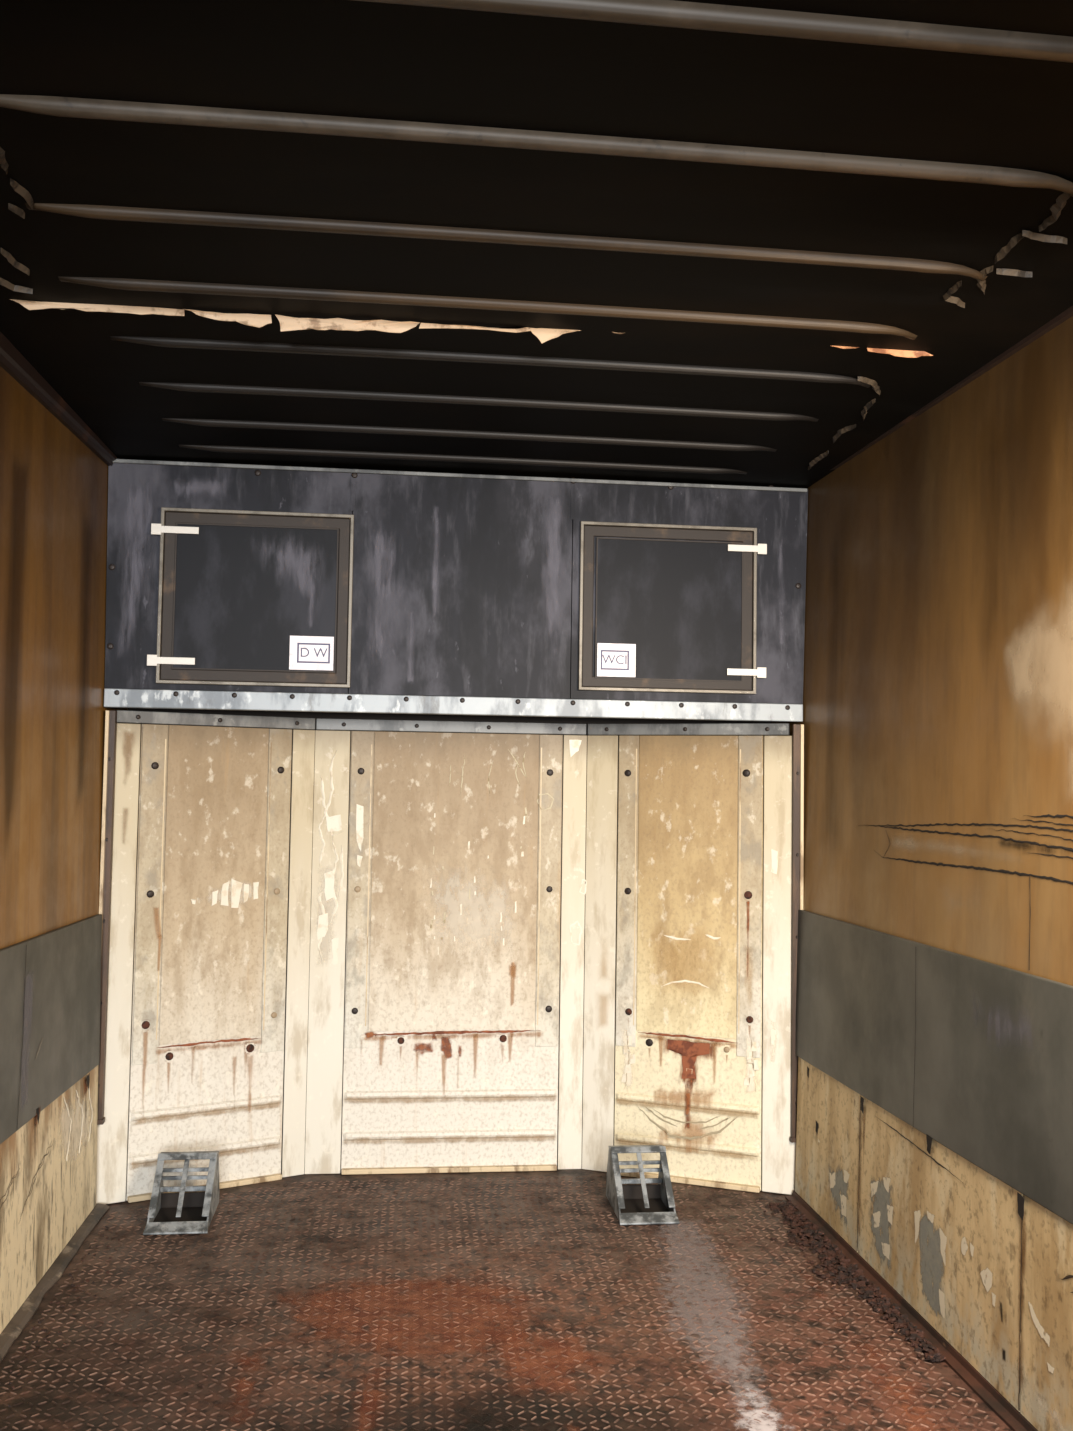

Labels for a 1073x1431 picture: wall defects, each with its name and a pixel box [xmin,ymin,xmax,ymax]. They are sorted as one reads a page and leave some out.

peeling [0,147,33,219]
peeling [943,193,1070,308]
peeling [0,248,580,343]
peeling [833,346,933,358]
rust [158,1038,258,1048]
rust [365,1030,540,1058]
rust [638,1032,734,1128]
peeling [829,1169,850,1223]
peeling [870,1177,893,1267]
peeling [914,1210,1003,1321]
damp [739,1388,779,1431]